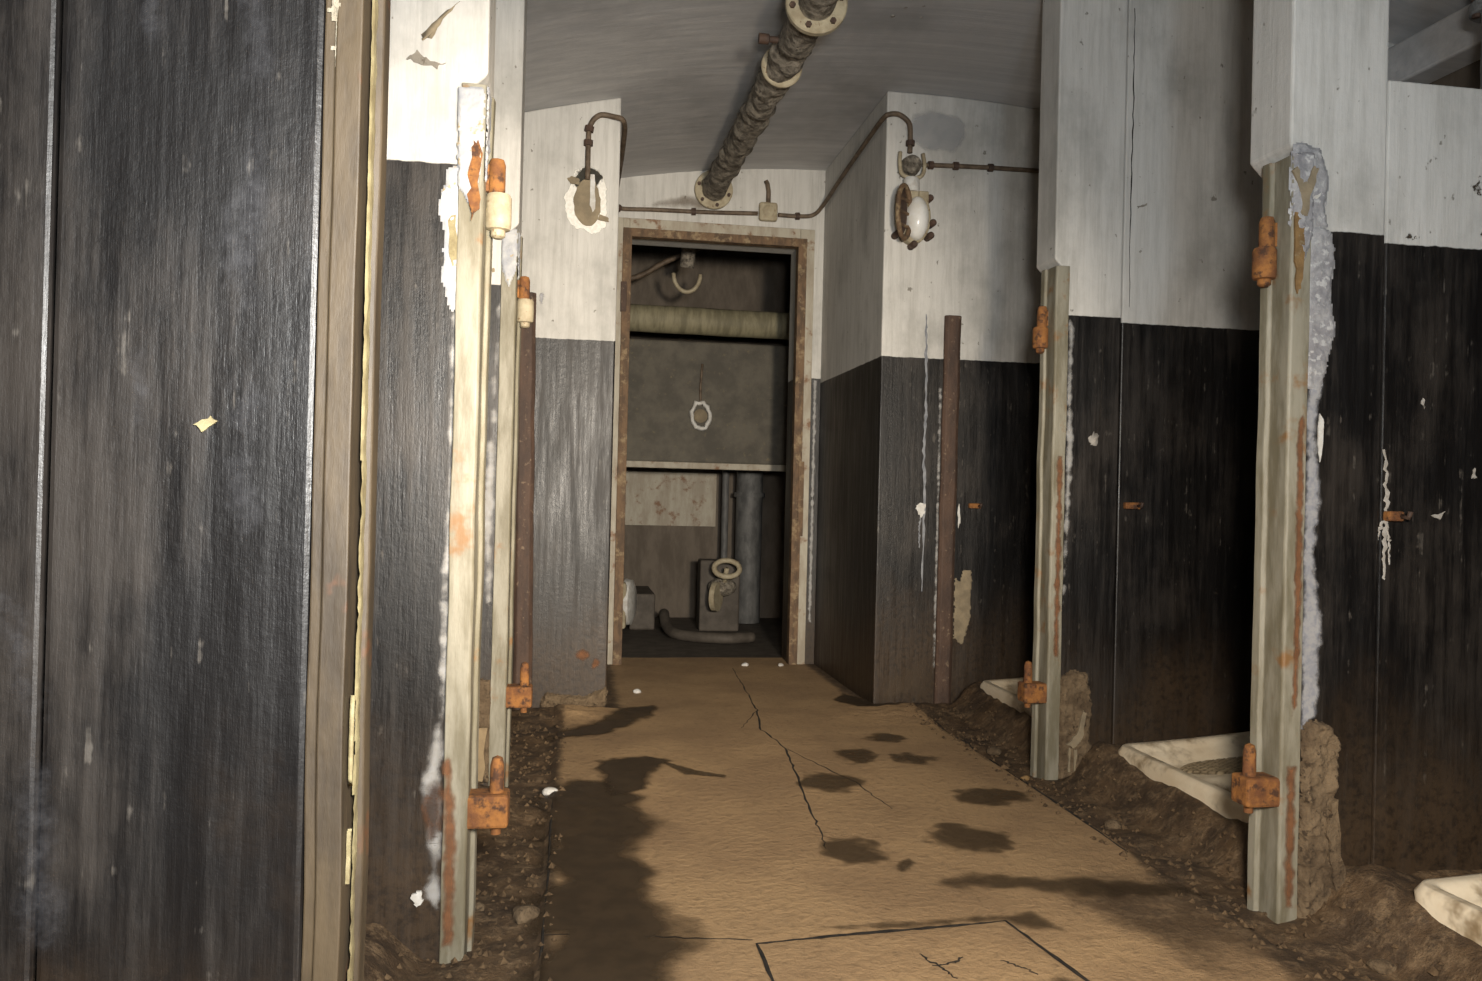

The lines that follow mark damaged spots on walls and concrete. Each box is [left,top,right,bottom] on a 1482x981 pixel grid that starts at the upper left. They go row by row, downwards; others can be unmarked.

peeling [327,0,341,63]
peeling [406,50,445,69]
peeling [438,86,492,312]
peeling [347,0,379,981]
spalling [1288,141,1347,918]
spalling [478,678,491,784]
crack [732,668,892,847]